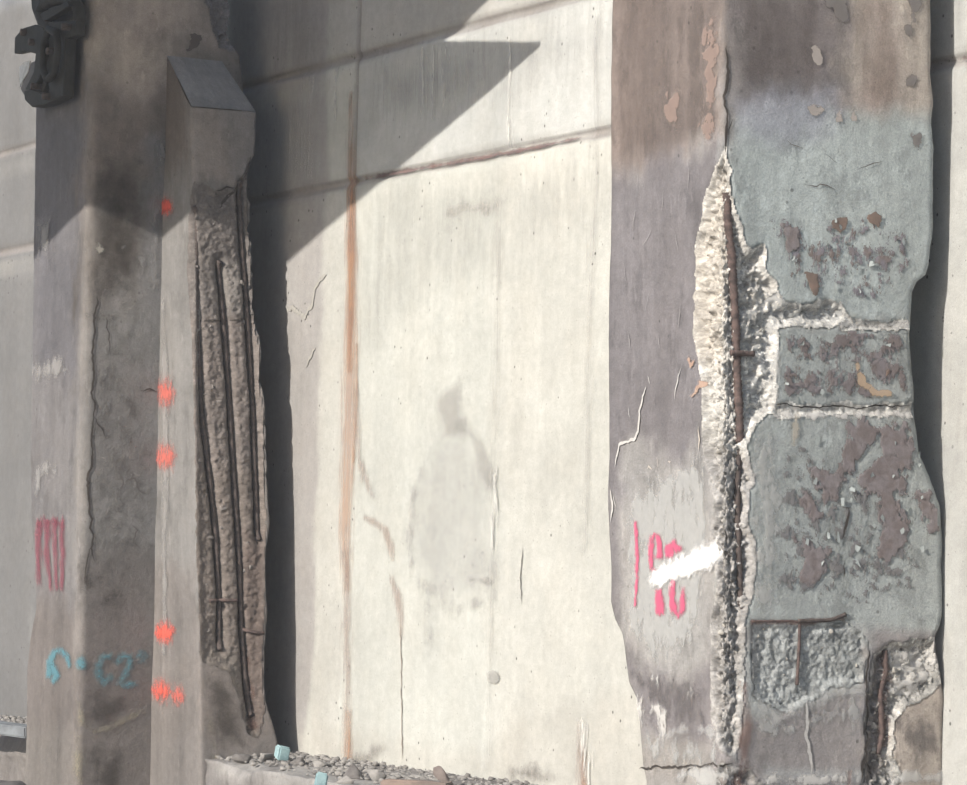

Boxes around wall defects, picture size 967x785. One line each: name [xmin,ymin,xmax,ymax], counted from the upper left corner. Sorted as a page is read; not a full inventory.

spalling [204,0,235,52]
crack [84,298,111,584]
spalling [187,157,267,738]
rust [341,138,577,580]
spalling [693,147,941,785]
crack [639,762,732,778]